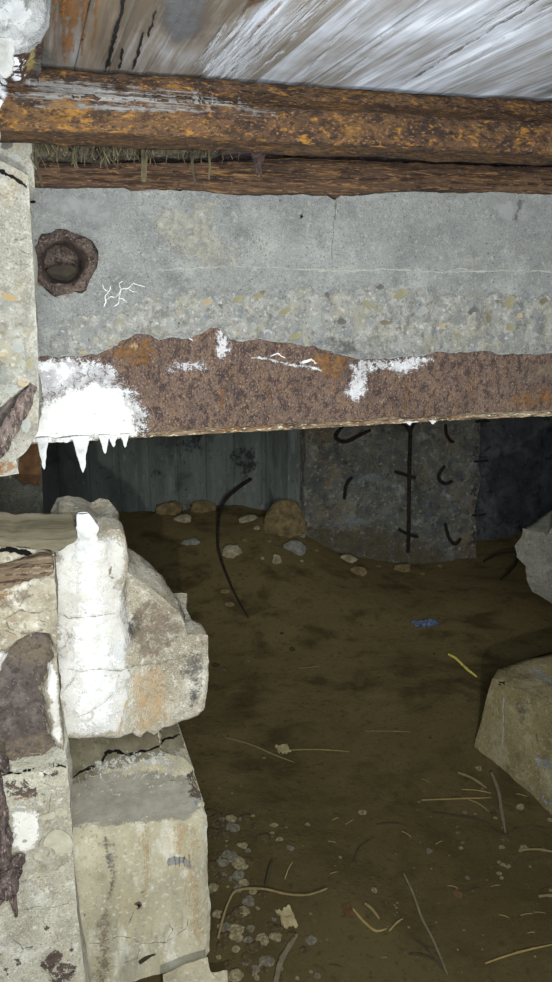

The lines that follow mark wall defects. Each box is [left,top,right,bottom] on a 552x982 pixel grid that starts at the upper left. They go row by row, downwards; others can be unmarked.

water stain [0,0,274,116]
water stain [201,0,321,79]
water stain [331,338,434,403]
water stain [33,357,153,472]
crack [2,734,181,778]